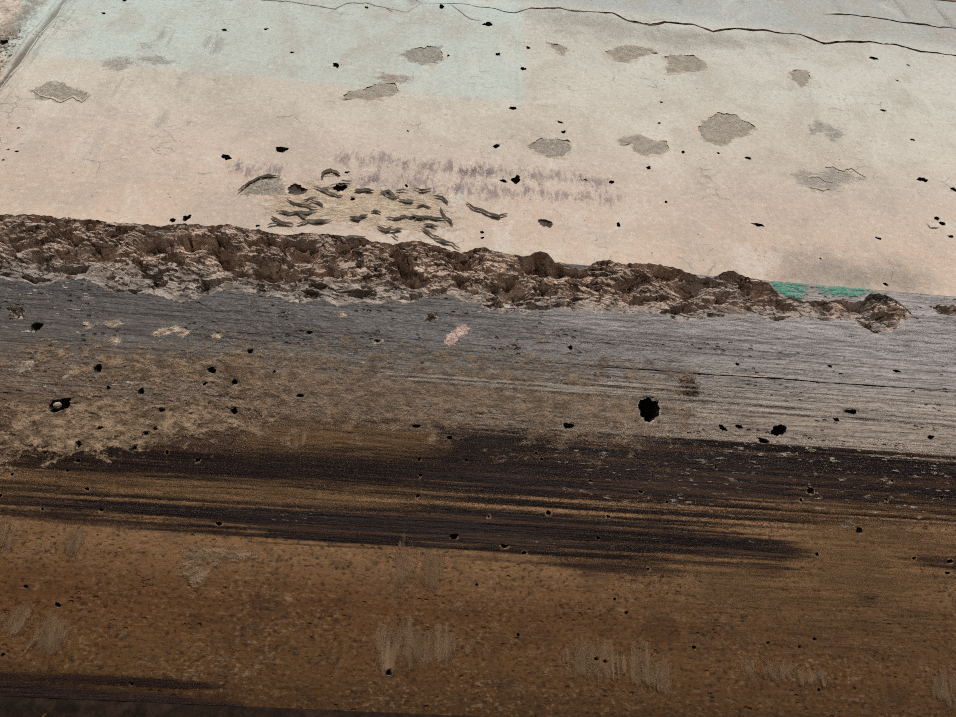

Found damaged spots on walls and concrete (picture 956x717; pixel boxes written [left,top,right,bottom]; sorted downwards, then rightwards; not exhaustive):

crack [271,0,956,56]
peeling [400,45,447,67]
peeling [601,45,710,75]
peeling [30,81,91,103]
peeling [339,73,411,101]
peeling [693,110,759,146]
peeling [526,137,573,160]
peeling [618,134,672,158]
spalling [0,214,912,334]
damp [532,382,738,408]
damp [754,395,825,414]
damp [0,419,956,639]